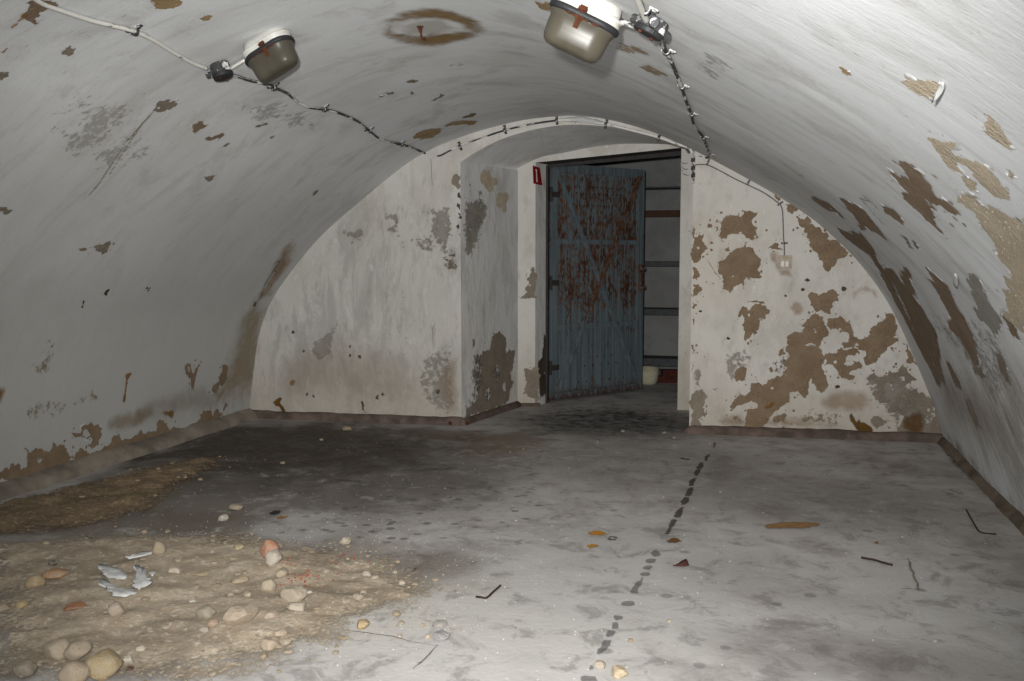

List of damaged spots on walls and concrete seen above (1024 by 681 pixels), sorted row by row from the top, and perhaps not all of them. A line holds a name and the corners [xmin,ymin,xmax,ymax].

spalling [20,0,58,26]
spalling [901,73,945,103]
peeling [385,169,510,270]
spalling [685,131,1024,434]
spalling [465,331,546,418]
spalling [0,420,179,483]